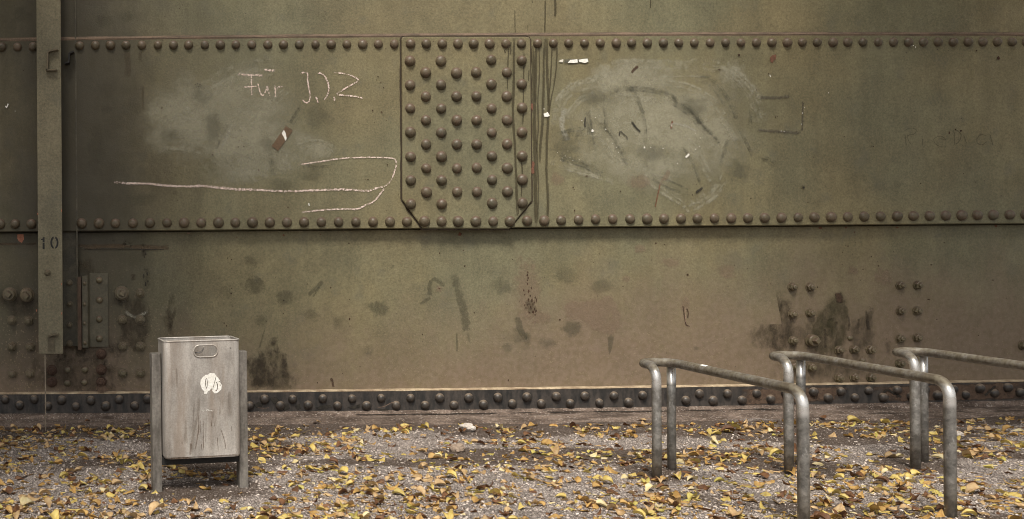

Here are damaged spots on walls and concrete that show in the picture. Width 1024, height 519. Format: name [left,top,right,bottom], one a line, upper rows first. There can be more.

leakage [504,15,558,221]